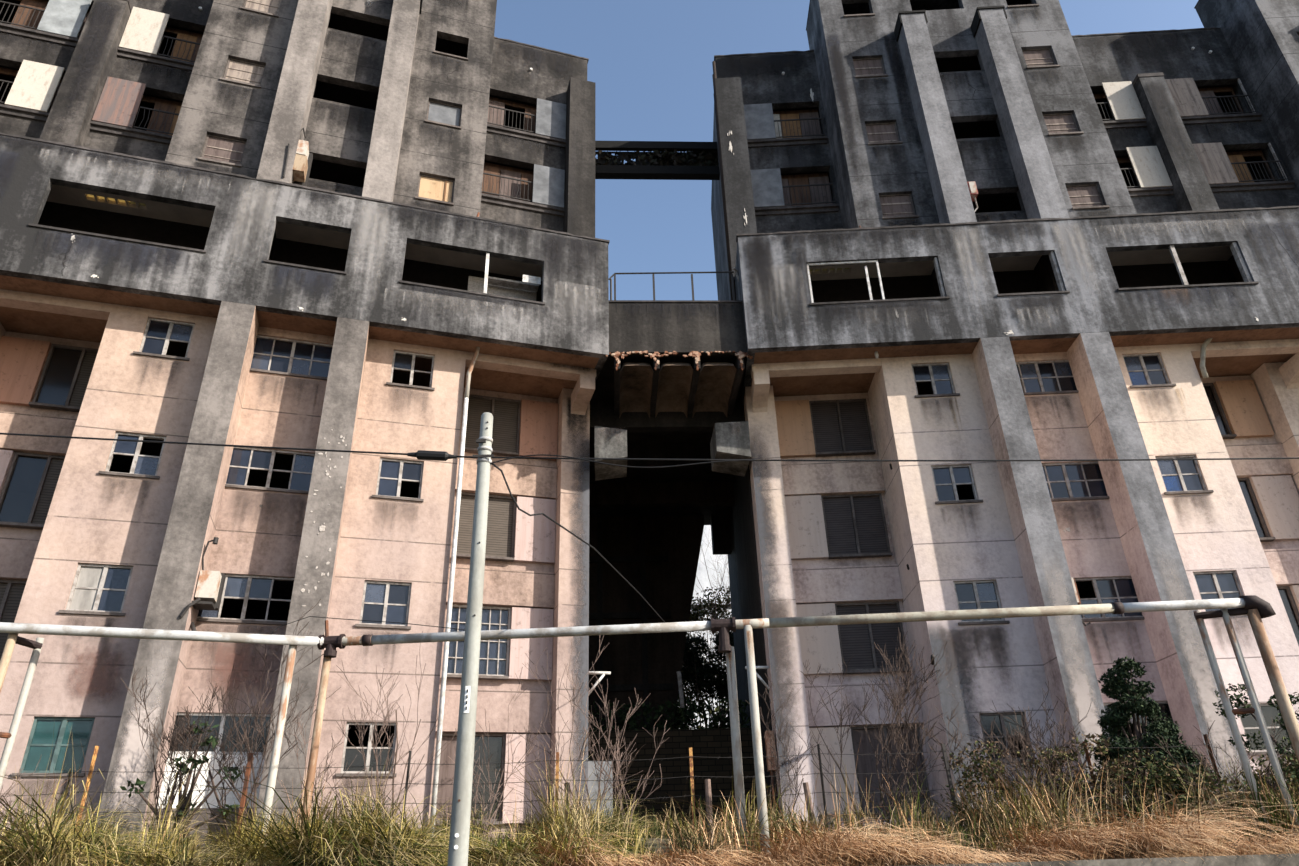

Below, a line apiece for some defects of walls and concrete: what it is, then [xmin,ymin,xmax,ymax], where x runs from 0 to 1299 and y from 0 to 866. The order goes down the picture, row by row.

damp [0,135,232,178]
damp [39,233,179,267]
damp [403,201,519,232]
damp [746,219,938,281]
damp [1165,209,1299,265]
damp [422,287,530,313]
spalling [605,351,753,371]
damp [751,446,794,794]
damp [75,652,119,696]
damp [928,629,982,802]